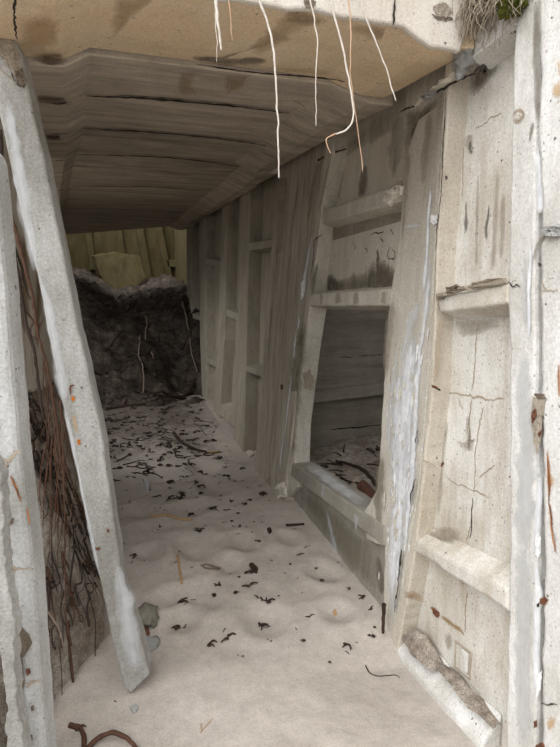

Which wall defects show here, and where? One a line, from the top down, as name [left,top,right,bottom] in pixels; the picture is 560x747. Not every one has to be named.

leakage [328,257,392,303]
crack [400,64,487,330]
peeling [383,190,509,593]
crack [437,329,501,538]
spalling [531,393,547,454]
rust [547,453,556,552]